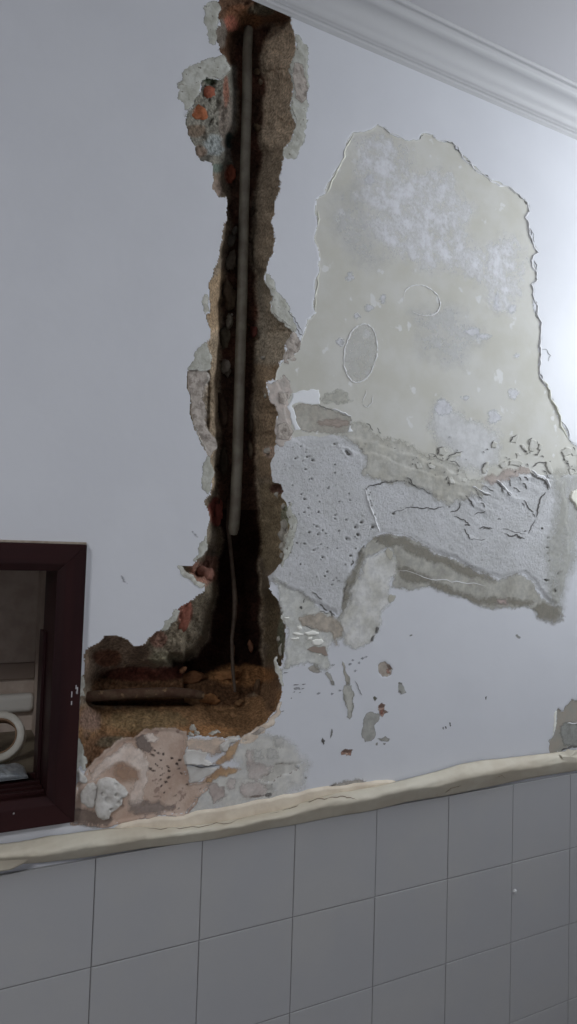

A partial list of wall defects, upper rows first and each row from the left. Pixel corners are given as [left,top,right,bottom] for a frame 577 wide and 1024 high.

peeling [70,0,577,828]
crack [319,405,551,540]
damp [187,734,305,813]